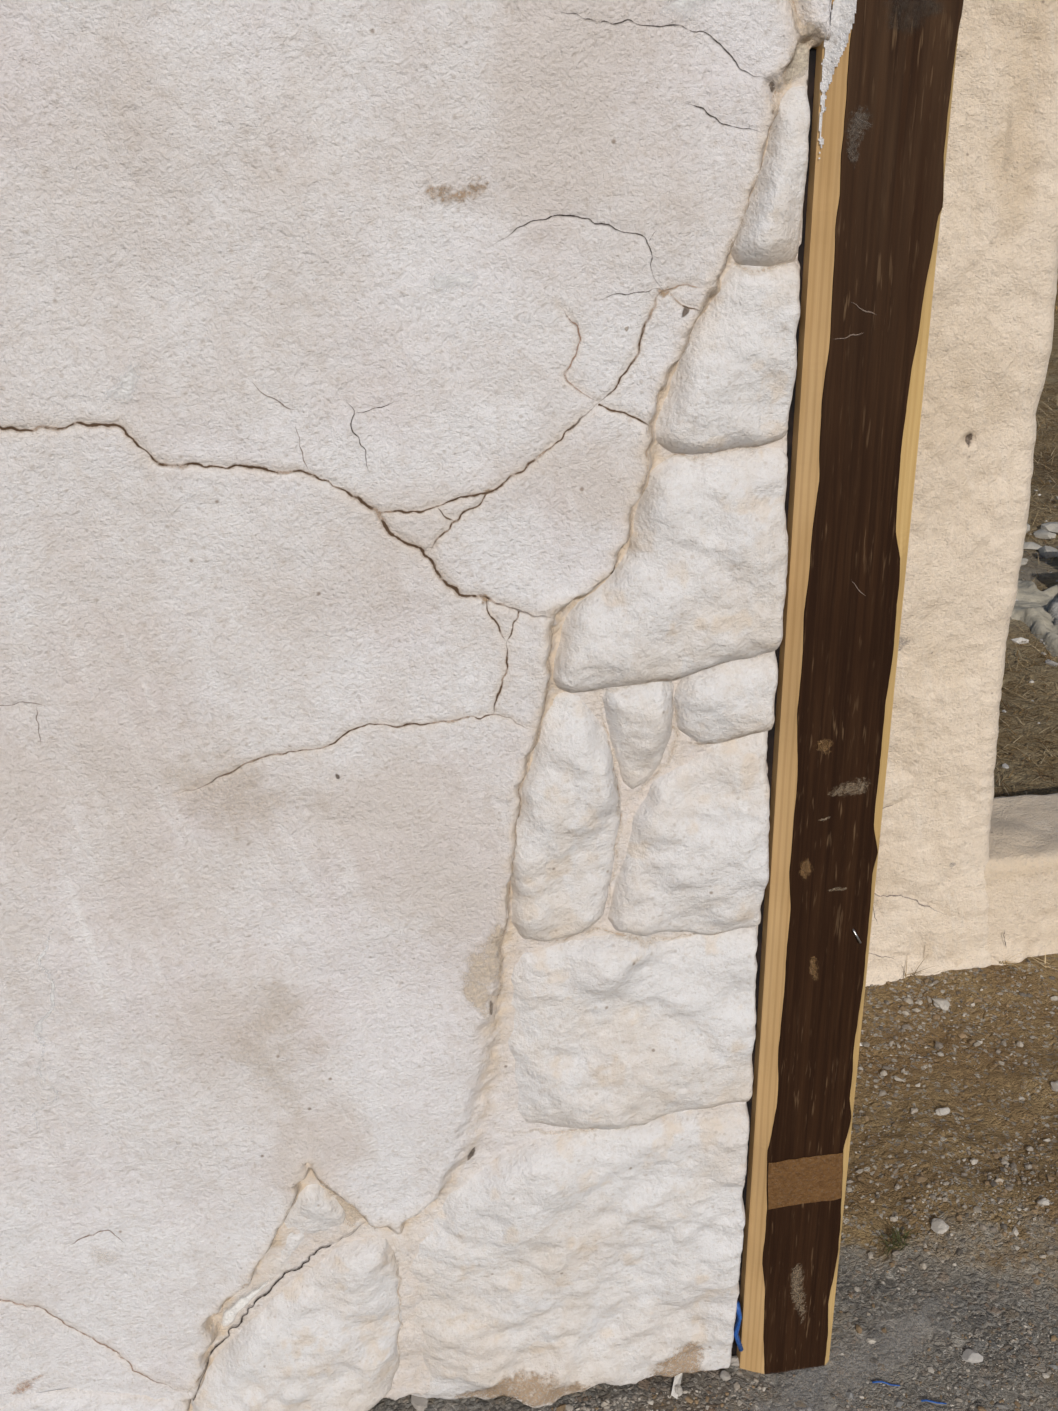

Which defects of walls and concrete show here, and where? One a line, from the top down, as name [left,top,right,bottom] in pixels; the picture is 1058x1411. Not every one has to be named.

crack [566,13,757,77]
crack [690,104,754,130]
crack [0,214,696,789]
crack [0,1299,159,1383]